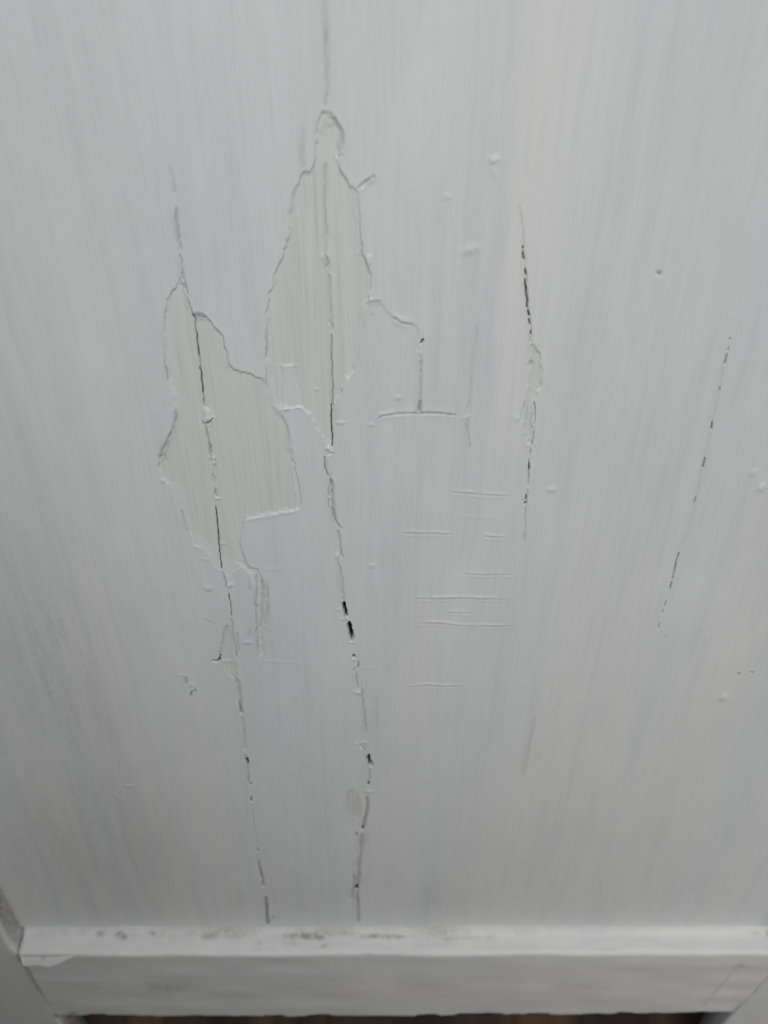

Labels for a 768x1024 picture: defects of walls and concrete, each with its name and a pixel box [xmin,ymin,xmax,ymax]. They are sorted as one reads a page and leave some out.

crack [320,0,332,112]
crack [517,200,535,346]
crack [416,337,426,416]
crack [167,160,276,924]
crack [321,155,379,924]
crack [522,444,534,545]
crack [656,334,734,655]